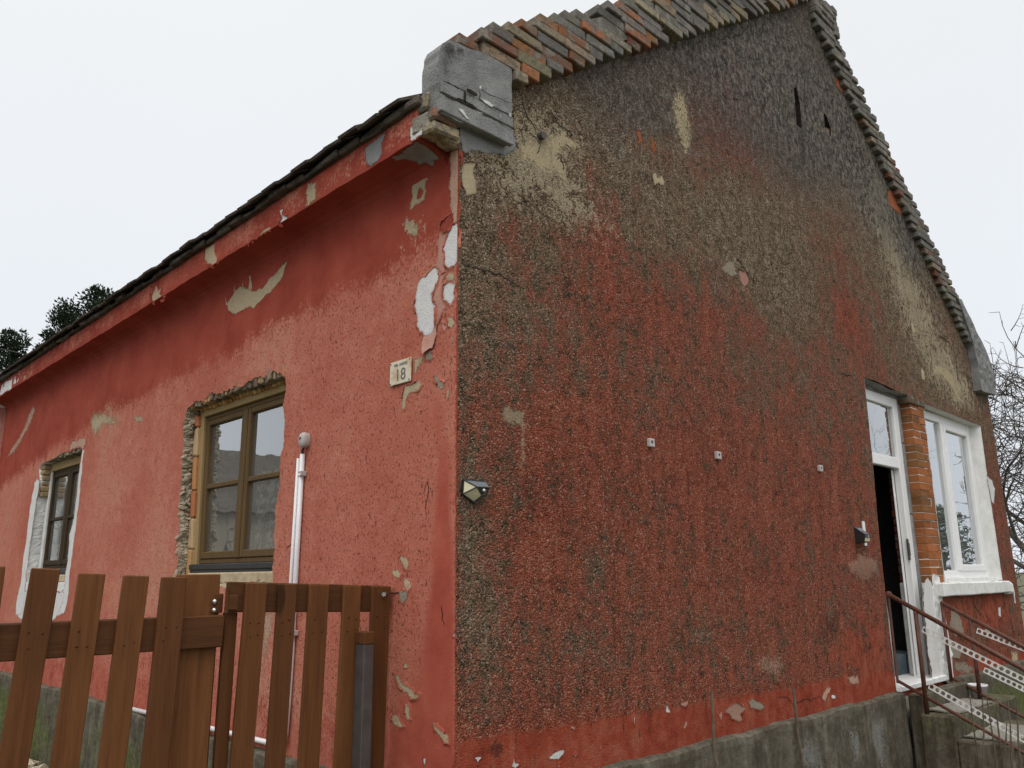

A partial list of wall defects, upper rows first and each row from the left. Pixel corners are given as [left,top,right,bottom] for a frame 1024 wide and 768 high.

crack [444,81,573,169]
flaking render [672,91,691,157]
flaking render [203,244,220,269]
peeling [225,259,290,316]
flaking render [364,125,581,413]
peeling [8,406,35,456]
peeling [53,411,120,621]
peeling [392,555,413,606]
peeling [390,661,423,732]
peeling [431,722,452,747]
peeling [718,697,765,724]